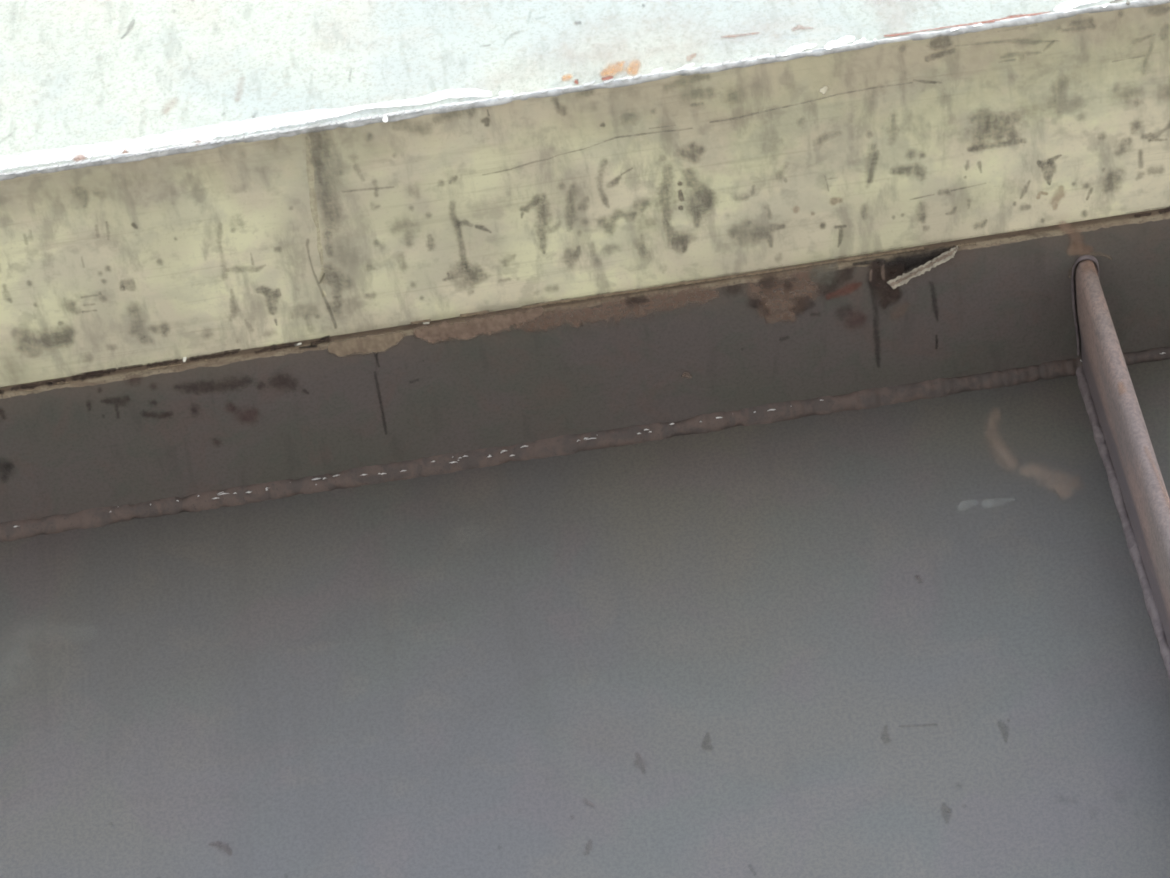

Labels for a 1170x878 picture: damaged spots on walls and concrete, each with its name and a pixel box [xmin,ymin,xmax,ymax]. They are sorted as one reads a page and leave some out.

peeling [296,246,925,357]